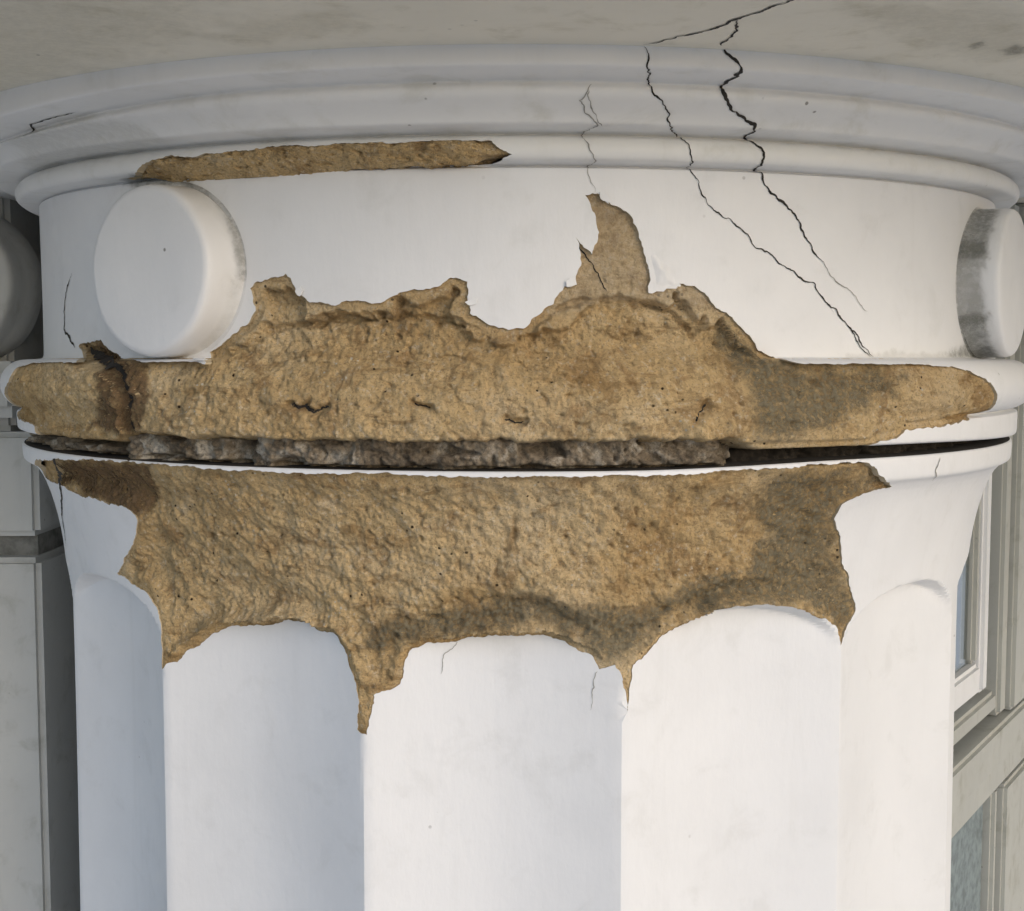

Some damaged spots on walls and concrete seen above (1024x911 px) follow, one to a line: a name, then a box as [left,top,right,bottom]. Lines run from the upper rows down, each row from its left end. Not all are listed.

spalling [128,140,511,182]
crack [579,84,602,187]
crack [645,0,872,356]
spalling [4,191,997,449]
crack [26,279,992,534]
spalling [35,458,892,735]